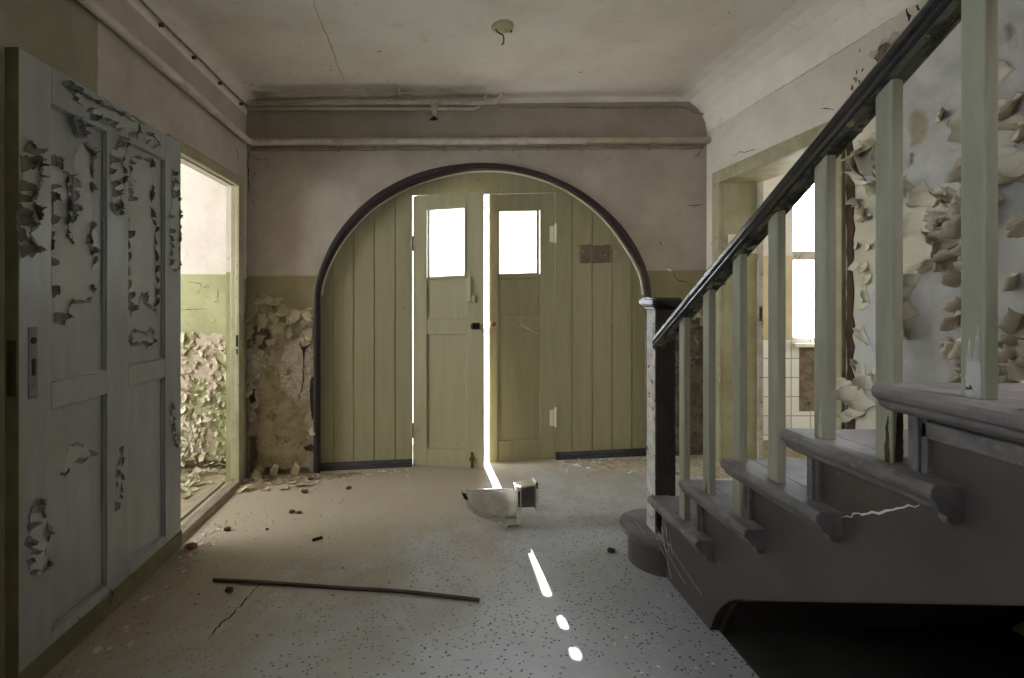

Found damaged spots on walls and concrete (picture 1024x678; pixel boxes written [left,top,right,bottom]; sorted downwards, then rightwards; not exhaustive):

peeling [850,30,902,91]
peeling [15,80,183,326]
peeling [841,131,876,223]
peeling [903,22,981,399]
peeling [998,0,1024,383]
peeling [170,318,226,467]
peeling [244,293,316,476]
crack [297,342,311,403]
peeling [836,241,876,423]
peeling [24,498,56,576]
crack [209,584,260,638]
crack [841,504,920,518]